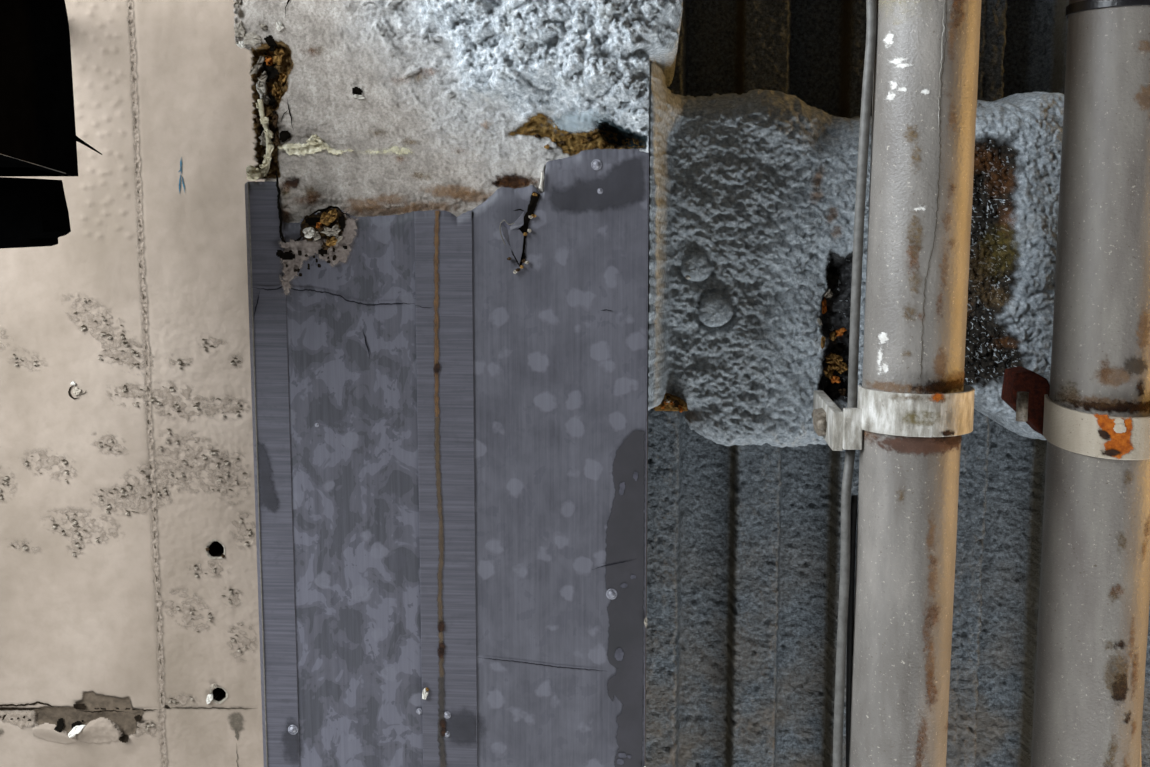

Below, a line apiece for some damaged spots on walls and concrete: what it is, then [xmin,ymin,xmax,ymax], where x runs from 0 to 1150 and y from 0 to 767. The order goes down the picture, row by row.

flaking render [509,110,647,156]
spalling [276,206,358,295]
rust [863,379,965,456]
rust [1054,358,1150,459]
rust [433,211,447,767]
water stain [605,430,645,767]
crack [0,701,53,710]
spalling [0,691,156,744]
crack [94,704,255,712]
rust [1105,641,1138,701]